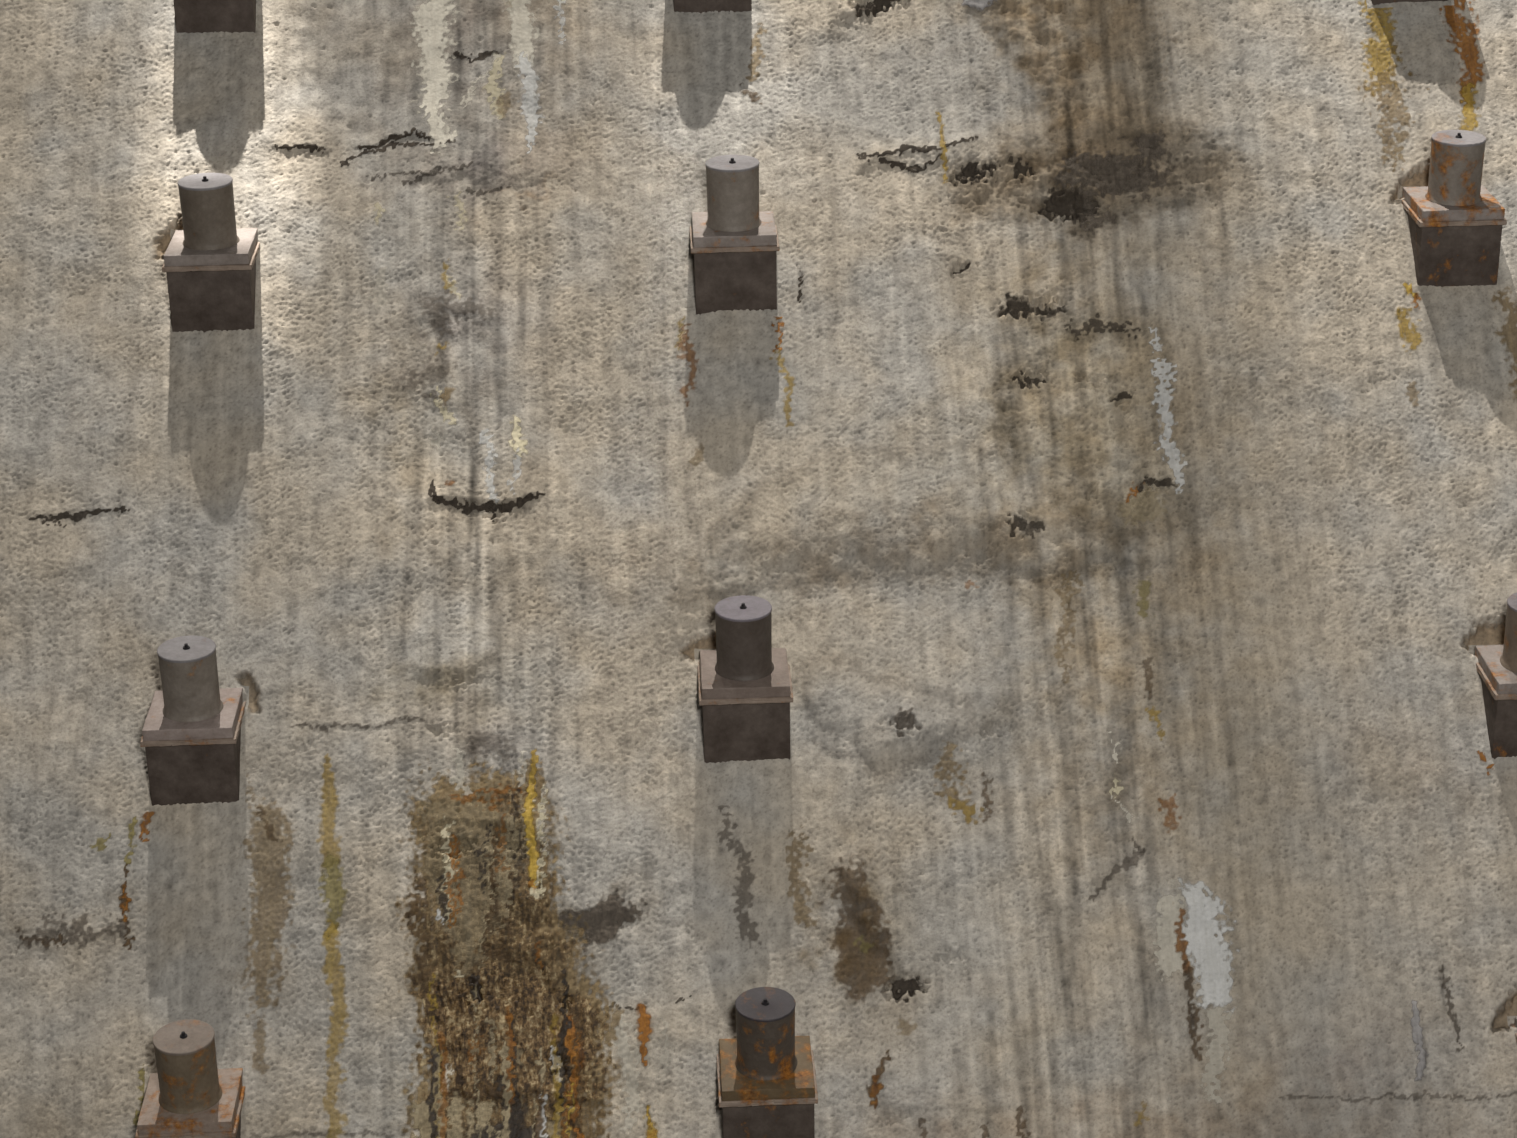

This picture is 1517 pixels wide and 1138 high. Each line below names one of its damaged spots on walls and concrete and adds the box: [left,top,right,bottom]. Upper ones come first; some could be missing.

spalling [852,0,900,18]
corrosion [1358,0,1414,172]
corrosion [1439,0,1483,131]
spalling [948,0,1236,236]
crack [274,127,456,167]
crack [29,506,130,528]
crack [428,479,545,522]